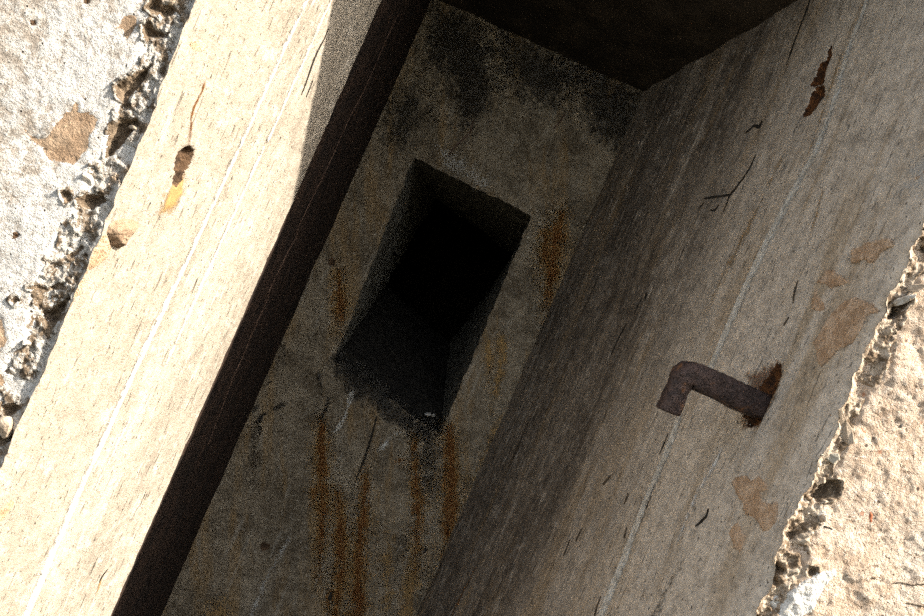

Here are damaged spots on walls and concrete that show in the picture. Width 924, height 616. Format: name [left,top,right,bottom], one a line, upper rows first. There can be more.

spalling [4,149,132,388]
spalling [104,0,195,150]
spalling [172,145,195,187]
crack [207,15,399,446]
crack [698,154,756,212]
crack [744,121,763,134]
spalling [852,224,924,388]
rust [311,421,370,616]
crack [355,416,377,481]
rust [395,439,425,553]
rust [442,426,460,555]
spalling [756,391,865,616]